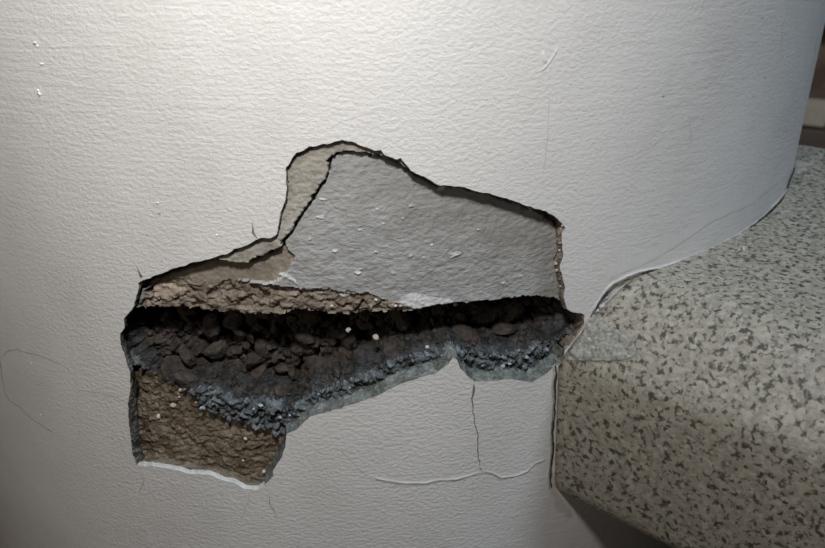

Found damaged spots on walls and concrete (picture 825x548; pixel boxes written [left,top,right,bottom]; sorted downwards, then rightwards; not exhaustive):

flaking render [120,140,584,490]
crack [589,168,795,316]
crack [336,364,557,505]